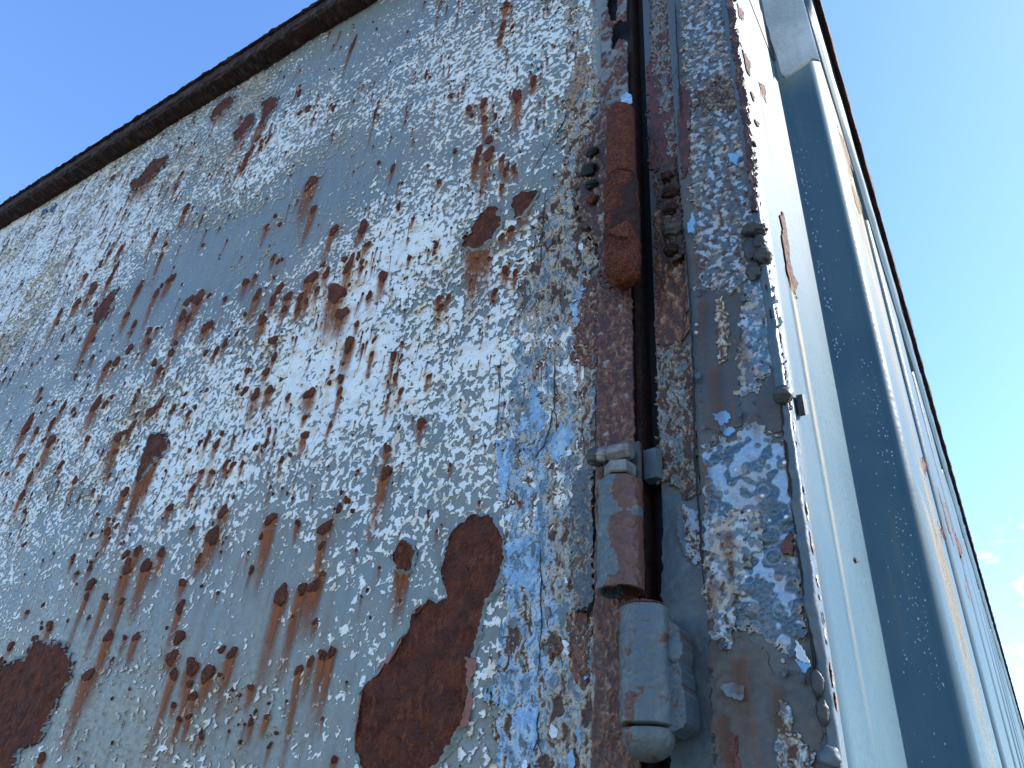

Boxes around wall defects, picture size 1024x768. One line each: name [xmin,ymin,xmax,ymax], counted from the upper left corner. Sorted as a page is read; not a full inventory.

rust [0,65,444,768]
peeling [0,0,602,768]
rust [345,500,508,768]
rust [418,0,591,320]
peeling [654,287,826,768]
peeling [742,49,751,76]